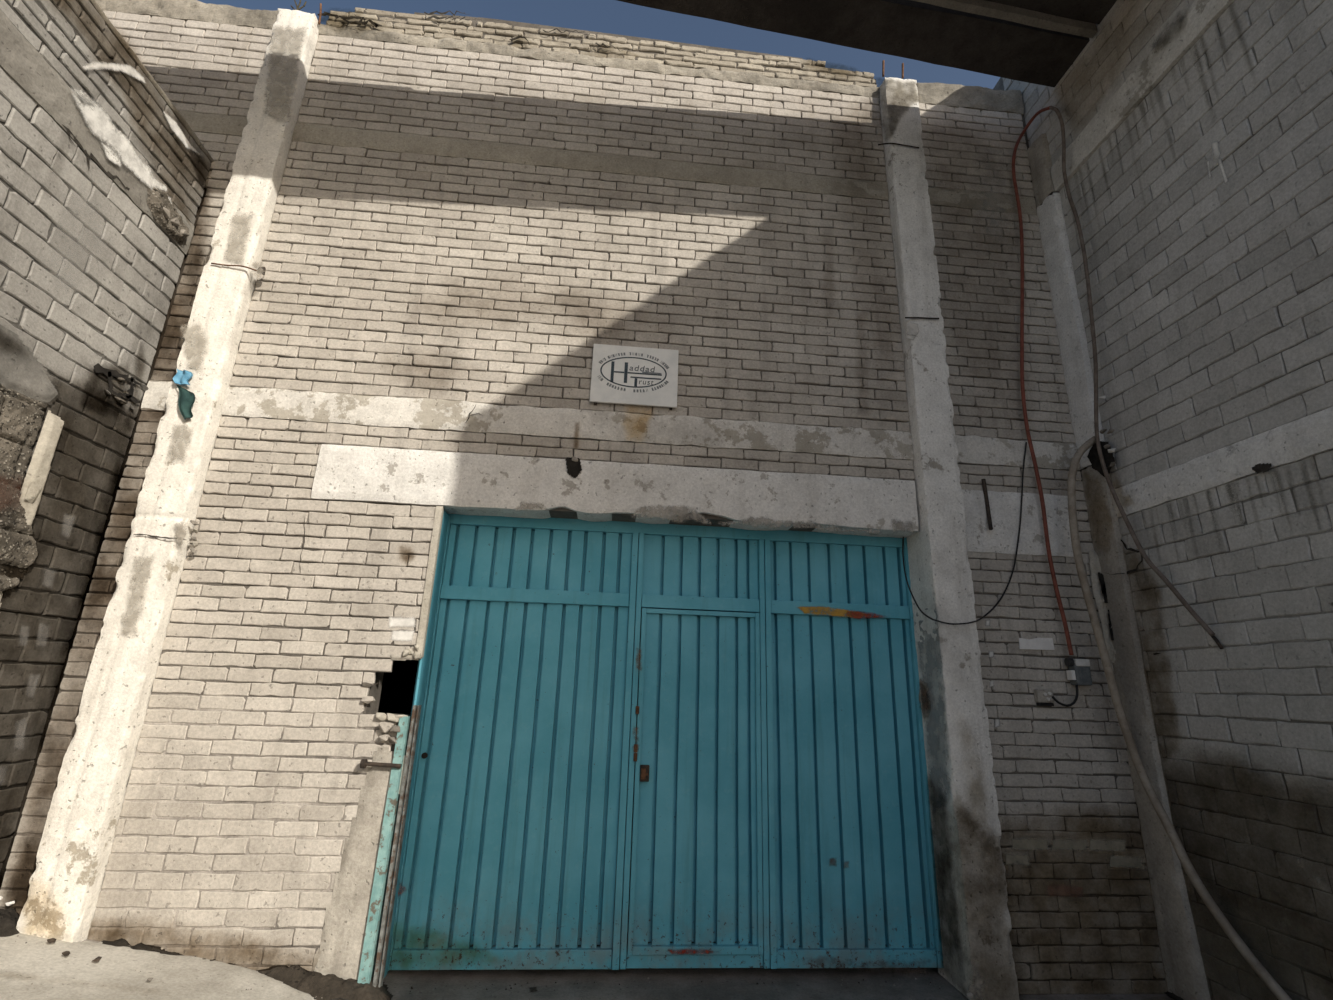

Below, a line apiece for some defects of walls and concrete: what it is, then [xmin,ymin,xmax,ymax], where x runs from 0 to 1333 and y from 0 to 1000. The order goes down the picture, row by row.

peeling [72,89,189,246]
spalling [0,324,64,607]
spalling [565,443,582,478]
spalling [361,682,408,744]
damp [928,781,959,977]
damp [1164,765,1333,1000]